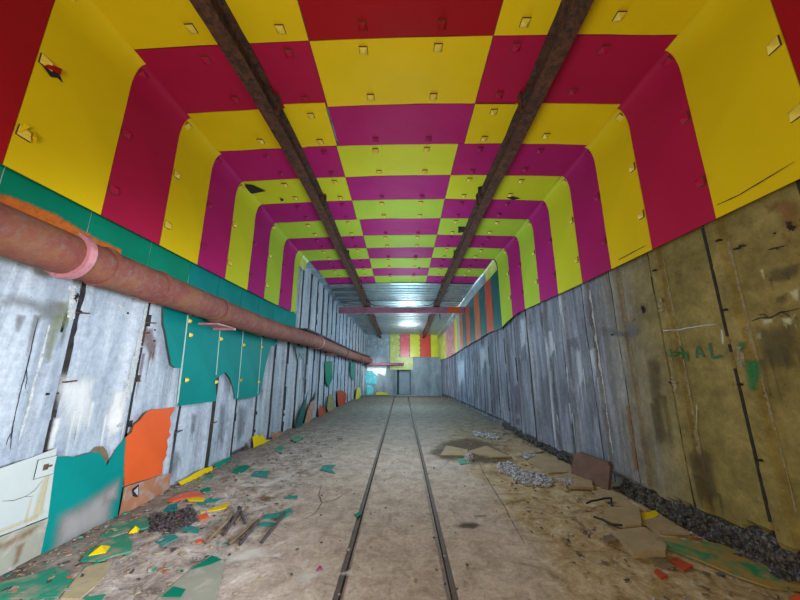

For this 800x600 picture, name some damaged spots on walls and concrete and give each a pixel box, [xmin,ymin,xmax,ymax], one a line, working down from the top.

corrosion [139,329,155,377]
leakage [649,361,671,442]
leakage [690,455,722,506]
peeling [58,483,118,546]